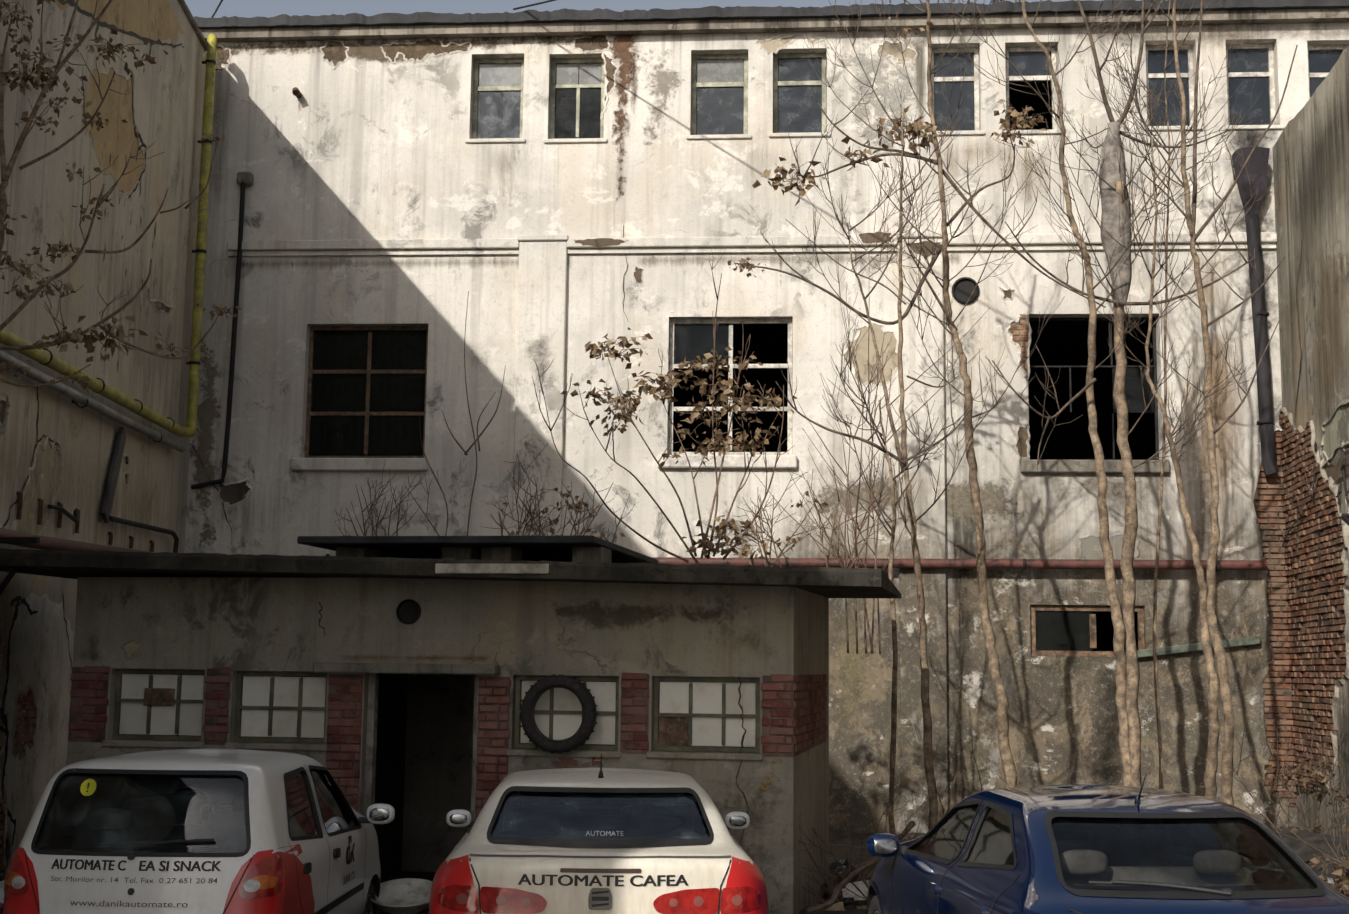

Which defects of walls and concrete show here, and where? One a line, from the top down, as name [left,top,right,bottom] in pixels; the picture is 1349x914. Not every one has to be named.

flaking render [319,40,349,70]
flaking render [380,38,472,64]
flaking render [998,286,1032,379]
damp [818,478,899,517]
damp [556,601,722,628]
damp [945,478,1021,679]
flaking render [1249,399,1349,808]
flaking render [0,592,74,880]
damp [1094,686,1119,784]